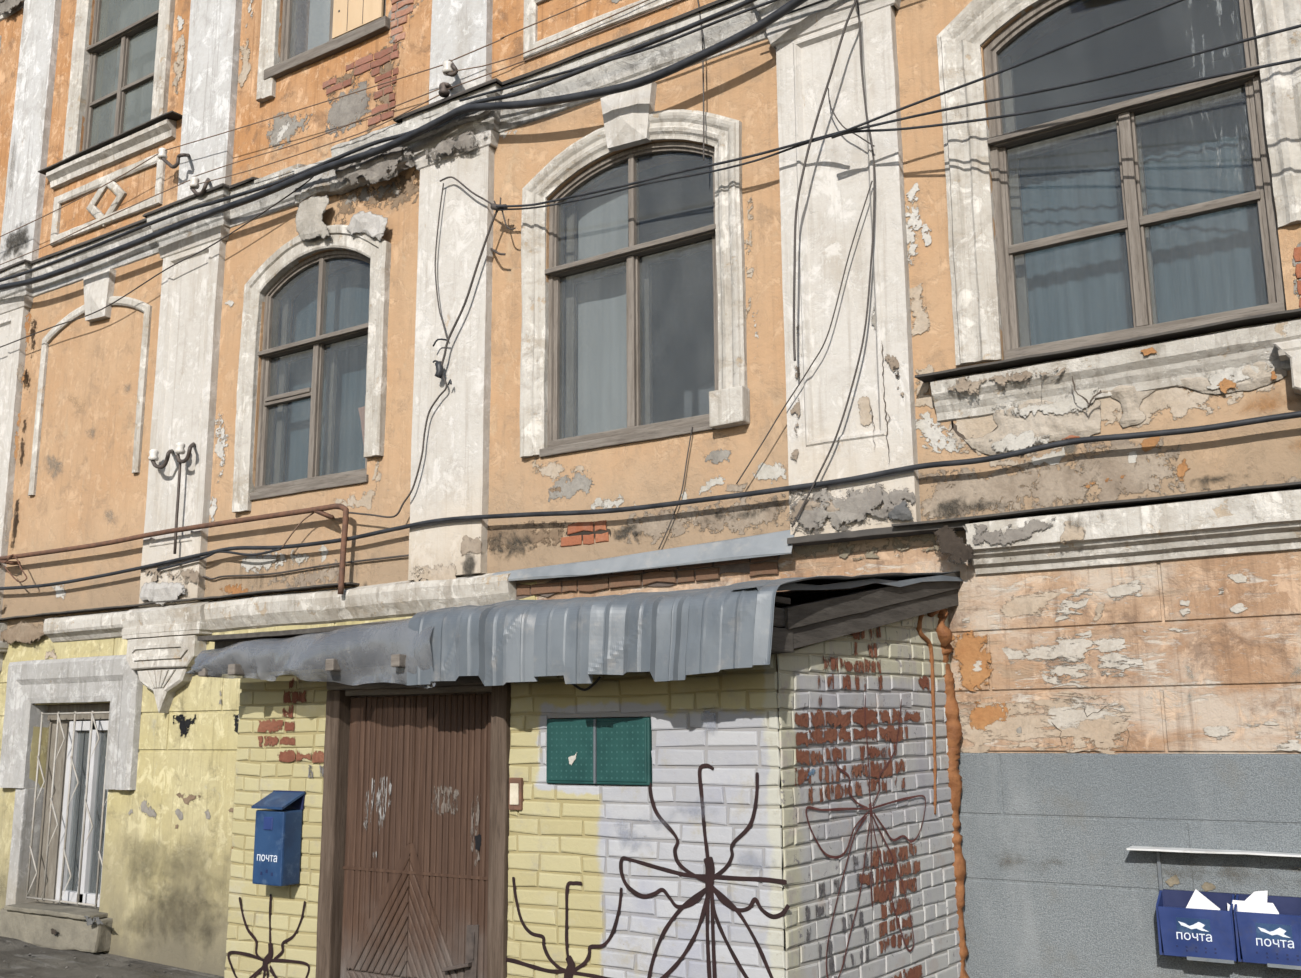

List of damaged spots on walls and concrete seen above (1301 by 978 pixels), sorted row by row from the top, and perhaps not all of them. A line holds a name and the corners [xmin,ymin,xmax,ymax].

peeling [905,183,932,266]
peeling [909,282,930,336]
crack [1041,376,1102,406]
crack [950,420,998,452]
flaking render [411,354,1275,600]
flaking render [1203,476,1301,491]
peeling [1219,571,1248,613]
peeling [1169,597,1190,632]
peeling [952,579,1144,755]
peeling [1274,731,1301,755]